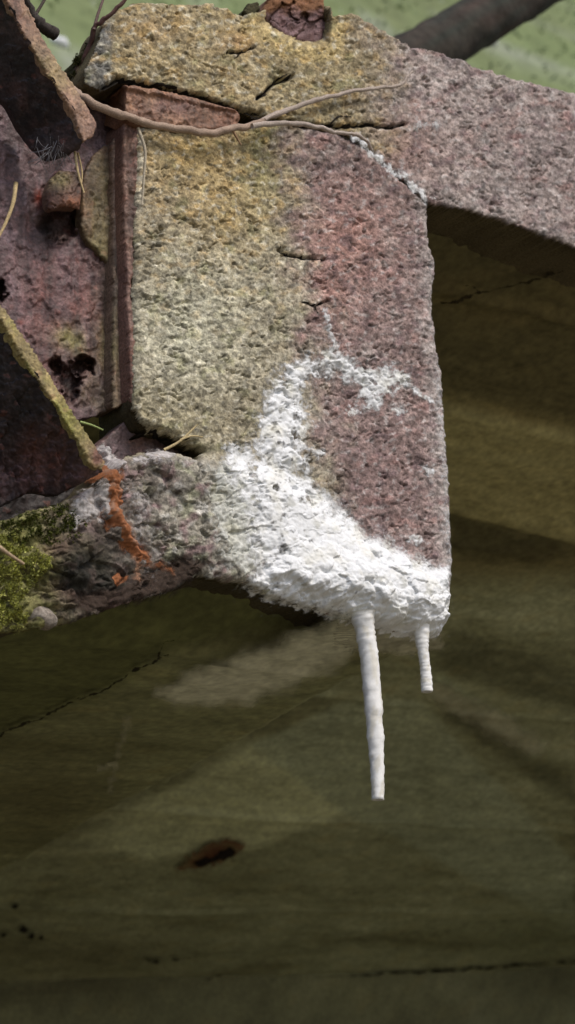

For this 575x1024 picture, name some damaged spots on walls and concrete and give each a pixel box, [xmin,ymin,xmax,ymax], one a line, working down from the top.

crack [101,74,291,120]
crack [279,246,324,261]
rust [86,465,175,586]
leakage [156,309,451,705]
crack [0,640,174,737]
spalling [177,839,245,871]